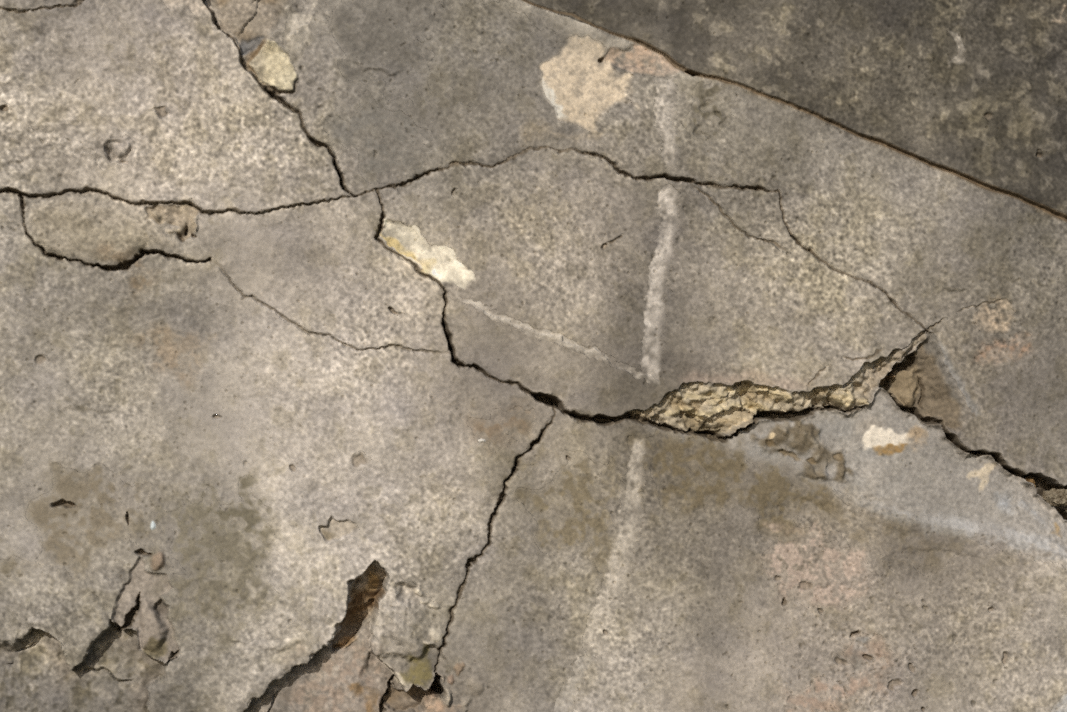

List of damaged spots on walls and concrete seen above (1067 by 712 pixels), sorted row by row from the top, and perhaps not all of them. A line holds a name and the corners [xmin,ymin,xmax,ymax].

crack [0,0,455,358]
spalling [206,0,293,75]
crack [518,0,1067,223]
crack [374,145,948,673]
spalling [628,330,1067,570]
crack [879,386,1067,521]
flaking render [0,557,446,712]
crack [379,674,398,712]